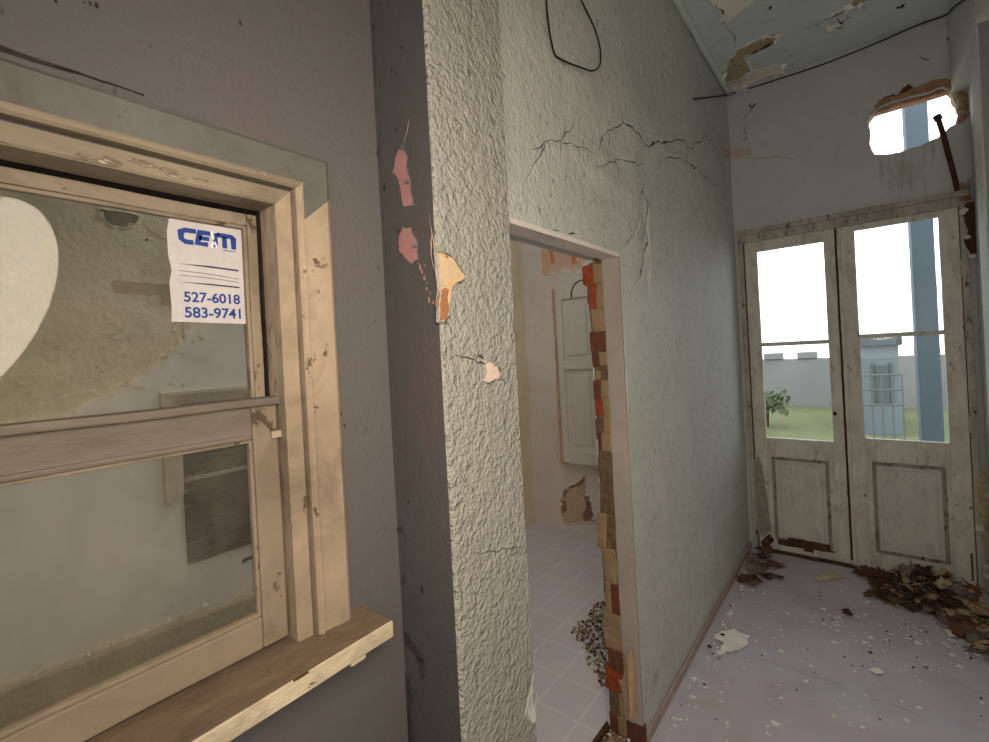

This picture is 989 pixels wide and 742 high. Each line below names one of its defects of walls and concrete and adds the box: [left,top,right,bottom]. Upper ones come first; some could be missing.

peeling [699,0,758,28]
flaking render [721,31,789,92]
flaking render [869,77,969,126]
peeling [392,145,414,207]
flaking render [94,206,142,230]
crack [635,163,653,294]
flaking render [396,226,466,325]
peeling [483,360,502,385]
flaking render [558,258,627,739]